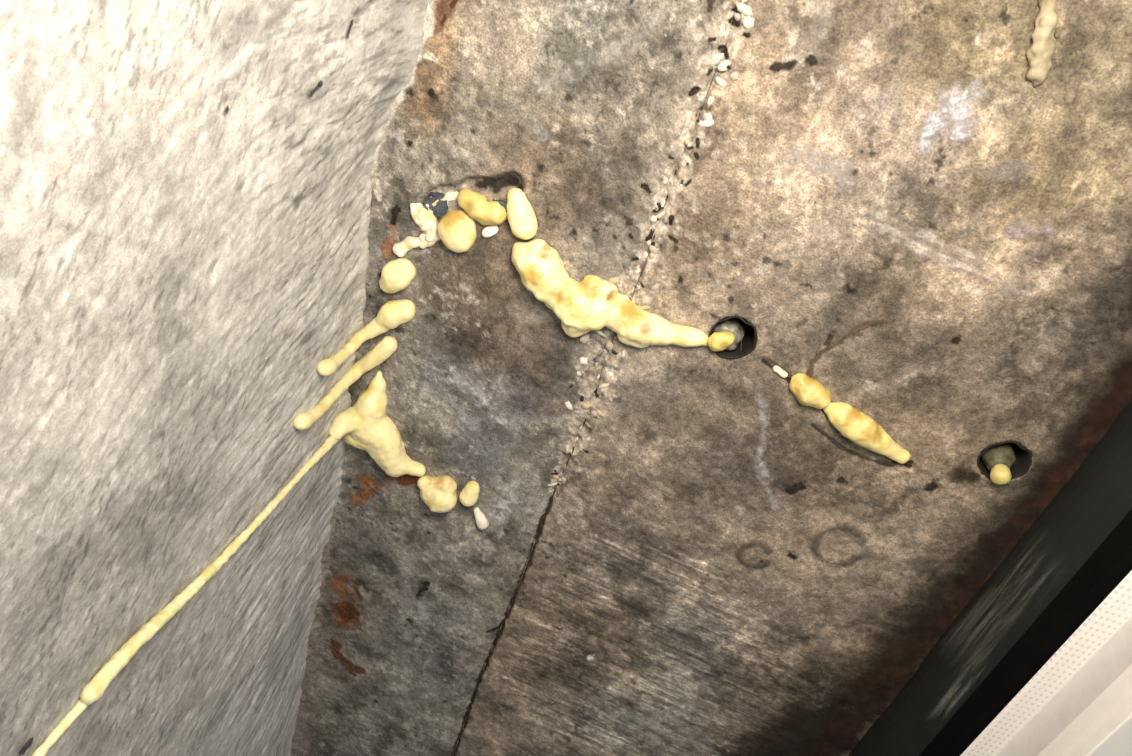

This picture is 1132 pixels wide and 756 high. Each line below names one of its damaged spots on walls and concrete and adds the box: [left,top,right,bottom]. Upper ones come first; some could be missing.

crack [664,51,723,205]
water stain [919,89,978,152]
crack [629,257,648,300]
water stain [868,210,1033,296]
crack [762,320,887,384]
crack [812,423,914,468]
crack [452,332,617,756]
water stain [734,299,1132,756]
corrosion [330,574,369,676]